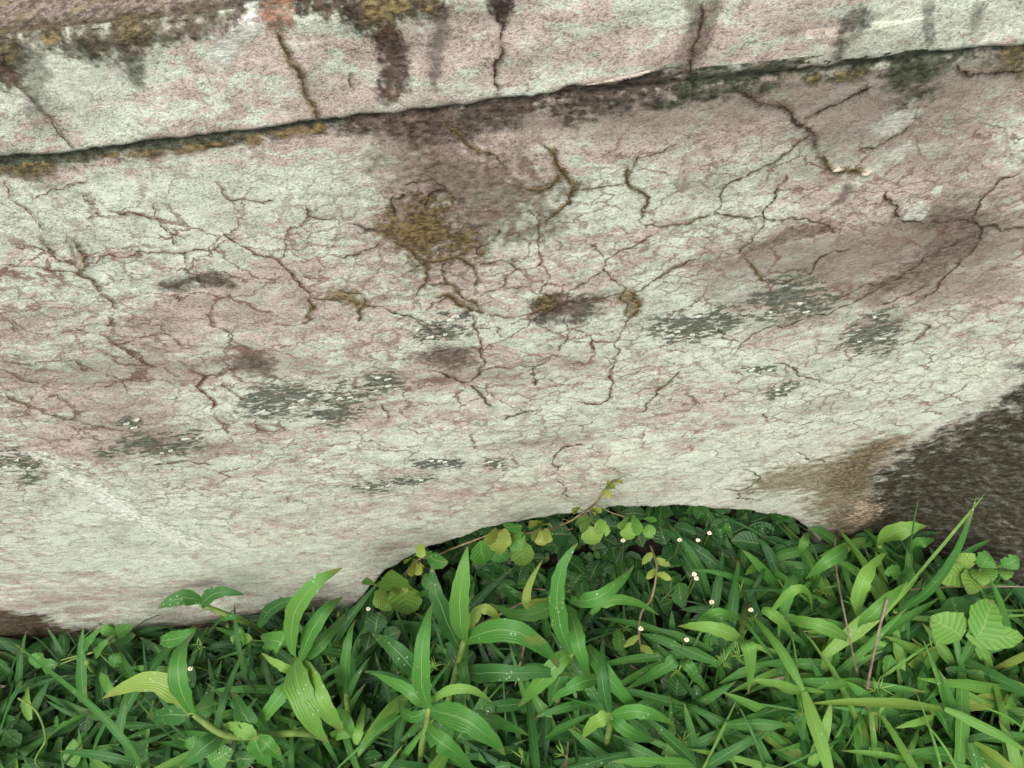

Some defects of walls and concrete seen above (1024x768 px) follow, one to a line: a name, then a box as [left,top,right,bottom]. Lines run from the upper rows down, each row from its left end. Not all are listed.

crack [275,32,319,120]
crack [493,7,505,86]
crack [956,65,1020,77]
leakage [293,0,721,242]
crack [1,86,911,435]
crack [717,172,1024,356]
leakage [530,294,605,325]
leakage [920,371,1024,435]
crack [154,459,209,467]